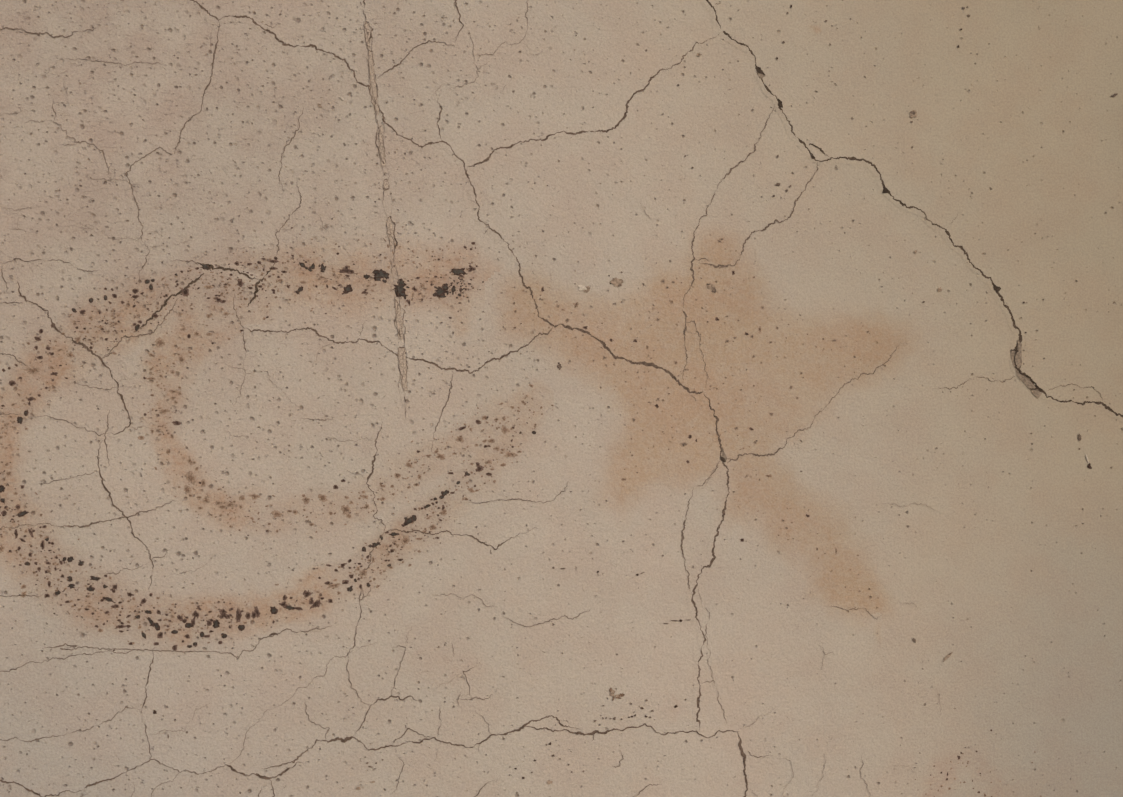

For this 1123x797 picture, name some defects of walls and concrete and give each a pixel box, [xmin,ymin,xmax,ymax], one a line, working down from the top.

crack [0,27,95,38]
crack [22,101,109,171]
crack [125,147,170,240]
crack [0,189,302,590]
corrosion [0,223,554,660]
crack [0,380,813,797]
crack [174,0,1123,423]
damp [482,218,930,654]